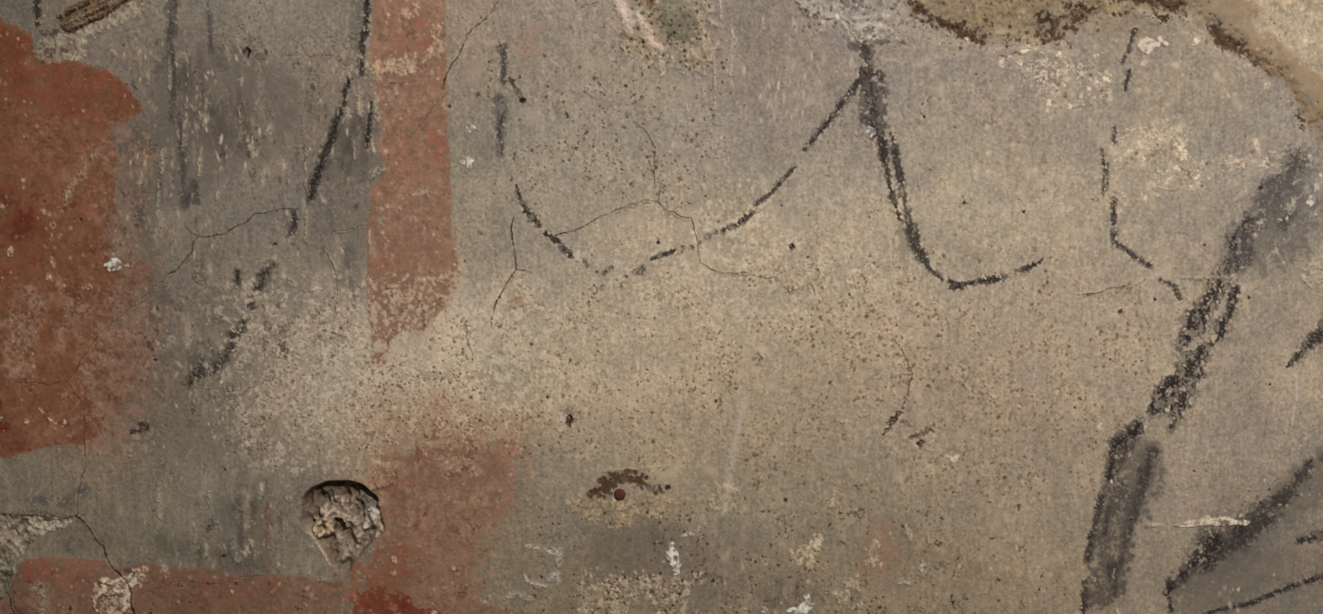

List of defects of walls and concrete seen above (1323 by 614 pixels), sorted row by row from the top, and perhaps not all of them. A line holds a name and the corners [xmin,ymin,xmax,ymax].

crack [549,119,816,295]
crack [465,215,534,363]
crack [0,142,370,614]
spalling [0,505,73,600]
spalling [297,479,392,583]